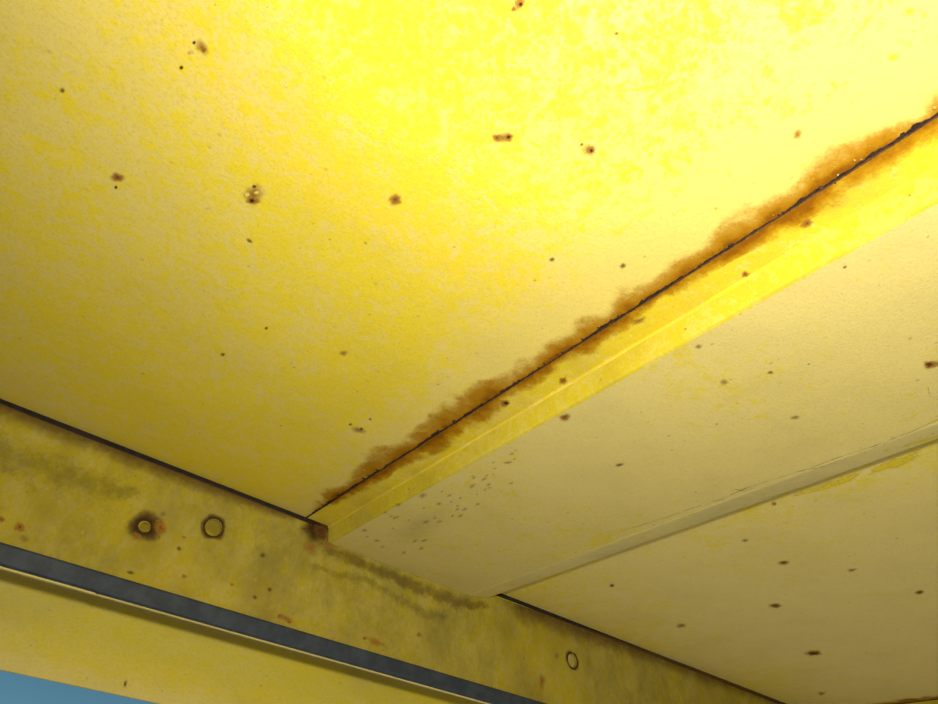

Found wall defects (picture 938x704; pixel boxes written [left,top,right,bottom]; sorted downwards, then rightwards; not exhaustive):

corrosion [245,185,259,204]
corrosion [303,100,938,553]
corrosion [130,512,166,540]